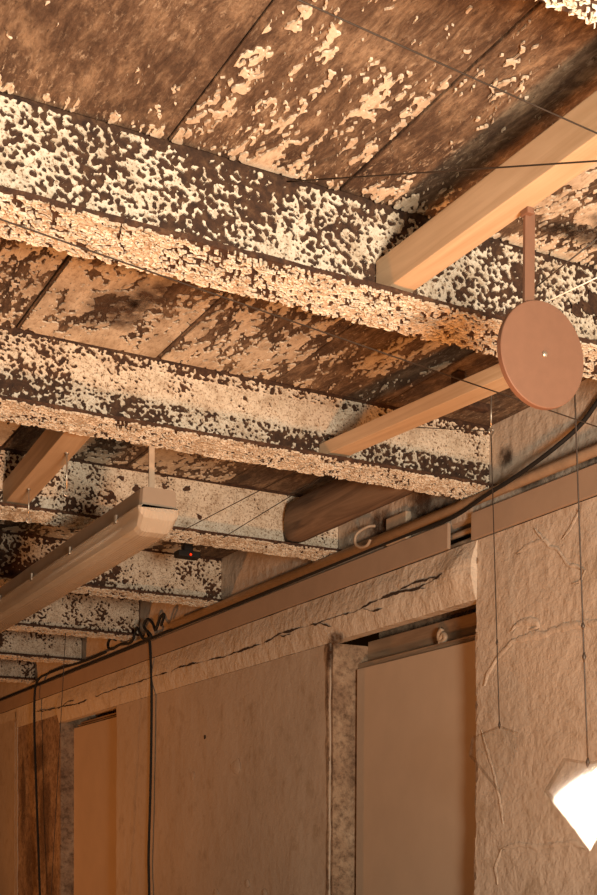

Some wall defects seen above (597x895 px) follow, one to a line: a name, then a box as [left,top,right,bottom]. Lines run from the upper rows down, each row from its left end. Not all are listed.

peeling [523,0,597,28]
leakage [89,284,168,327]
peeling [532,162,597,380]
peeling [0,0,542,684]
crack [37,573,442,712]
leakage [327,634,342,667]
crack [484,616,597,686]